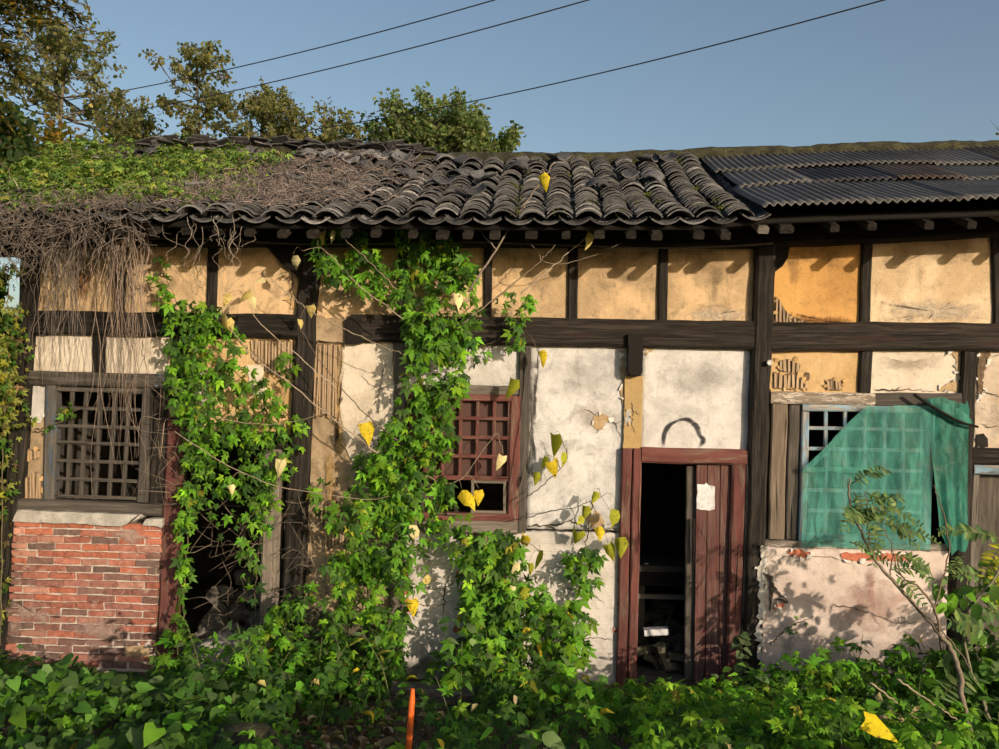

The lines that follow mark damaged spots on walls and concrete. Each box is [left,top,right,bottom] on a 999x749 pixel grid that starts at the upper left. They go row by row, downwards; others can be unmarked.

peeling [770,358,810,392]
peeling [592,347,633,433]
spalling [788,549,814,561]
spalling [841,551,908,564]
crack [835,604,927,624]